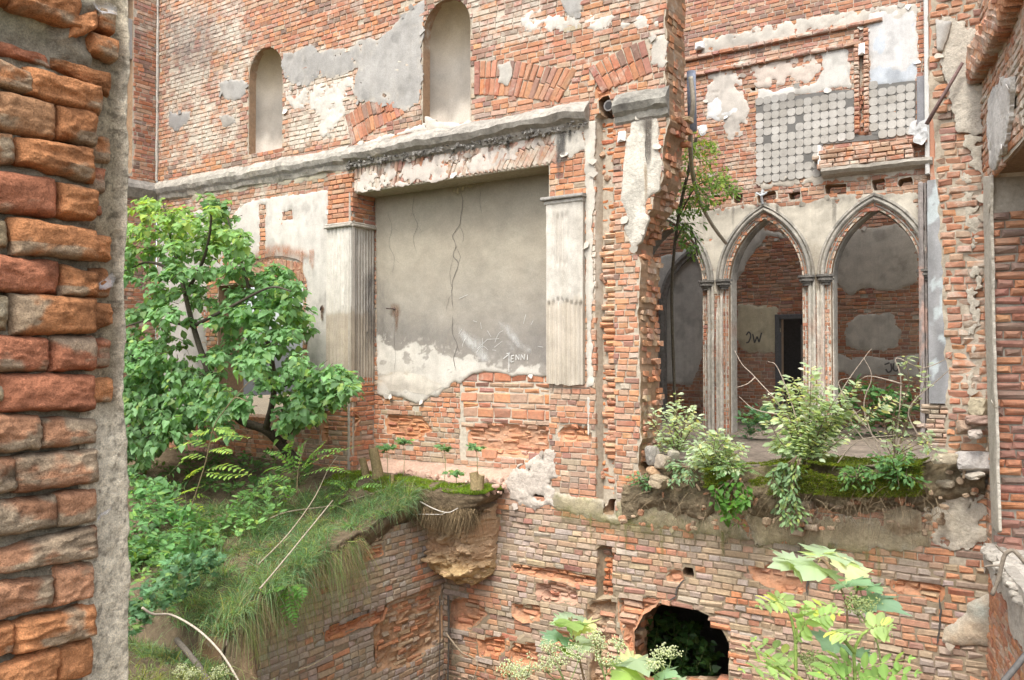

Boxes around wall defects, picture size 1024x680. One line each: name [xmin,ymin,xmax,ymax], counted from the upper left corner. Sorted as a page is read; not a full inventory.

crack [446,192,481,369]
flaking render [157,0,1016,553]